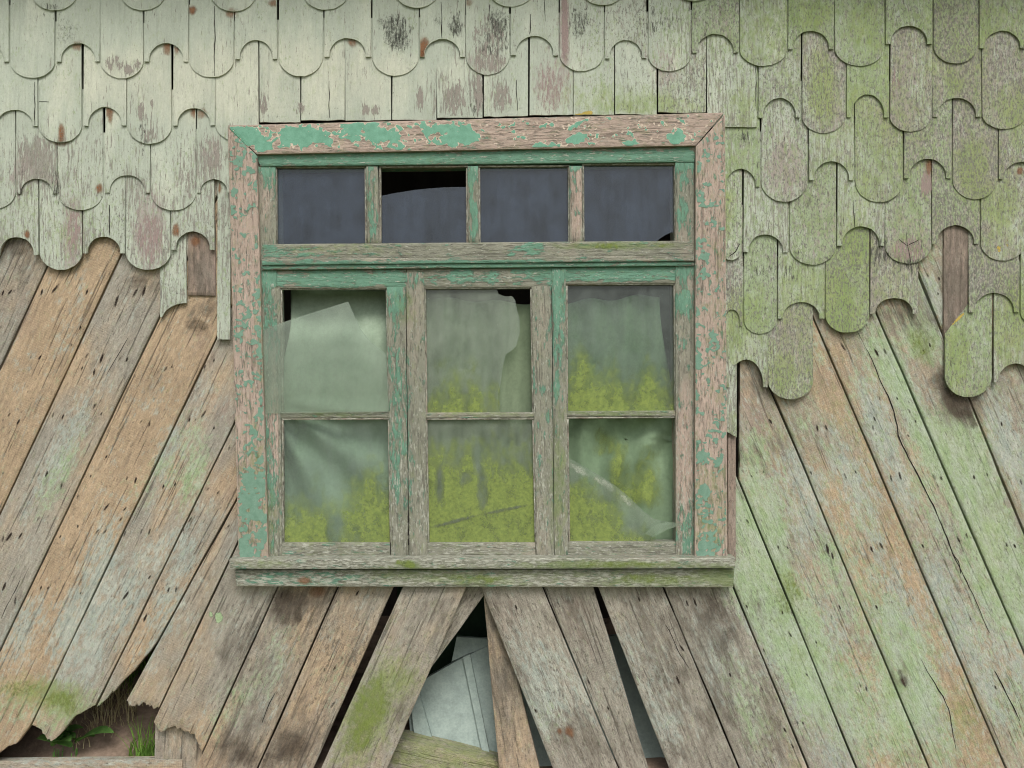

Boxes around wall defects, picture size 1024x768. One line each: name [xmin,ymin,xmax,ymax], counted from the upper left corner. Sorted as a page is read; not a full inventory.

peeling [201,15,599,557]
peeling [612,114,726,556]
crack [858,333,990,633]
crack [921,660,956,748]